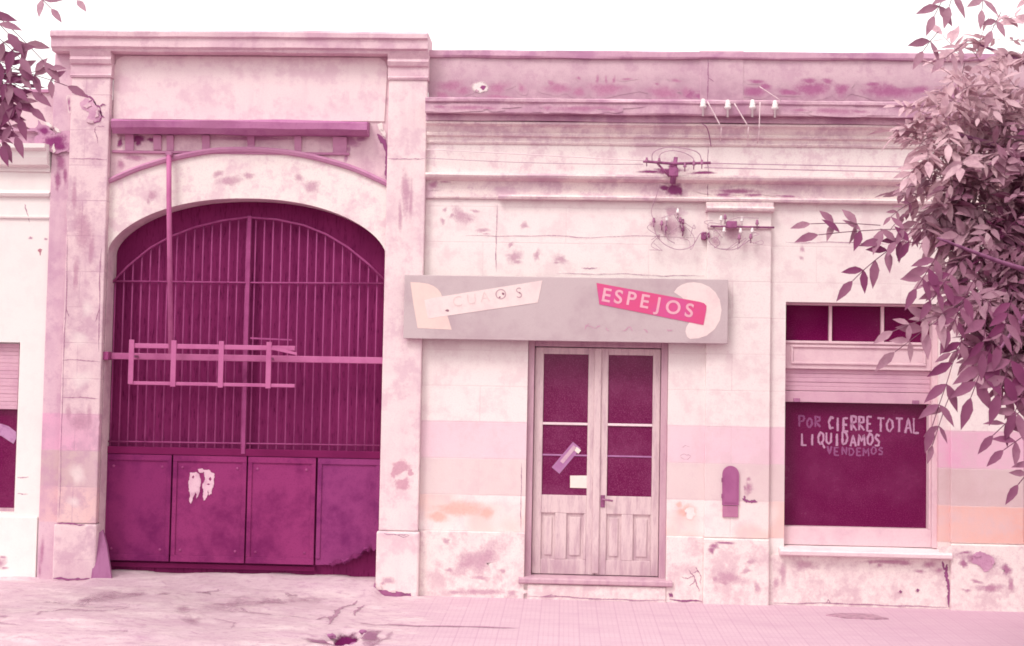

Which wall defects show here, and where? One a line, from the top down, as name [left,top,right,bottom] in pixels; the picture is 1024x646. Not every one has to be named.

water stain [428,72,700,114]
water stain [744,76,973,117]
peeling [387,455,417,493]
spalling [972,551,995,572]
crack [532,568,702,602]
hole [334,634,358,646]